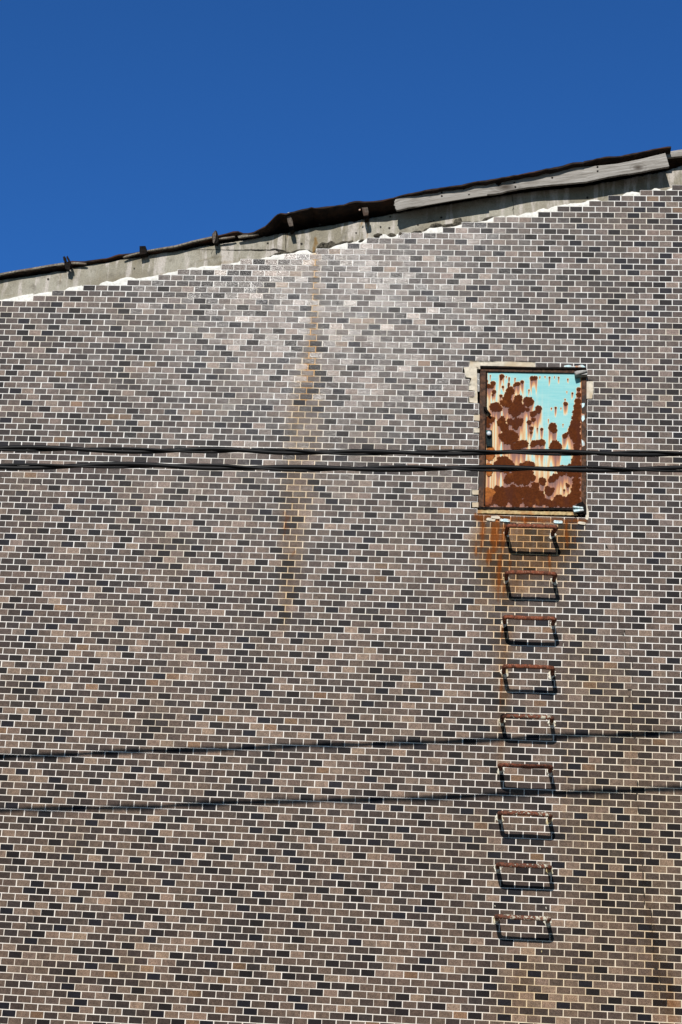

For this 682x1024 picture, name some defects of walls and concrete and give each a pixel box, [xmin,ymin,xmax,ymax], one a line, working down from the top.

rust [483,374,581,522]